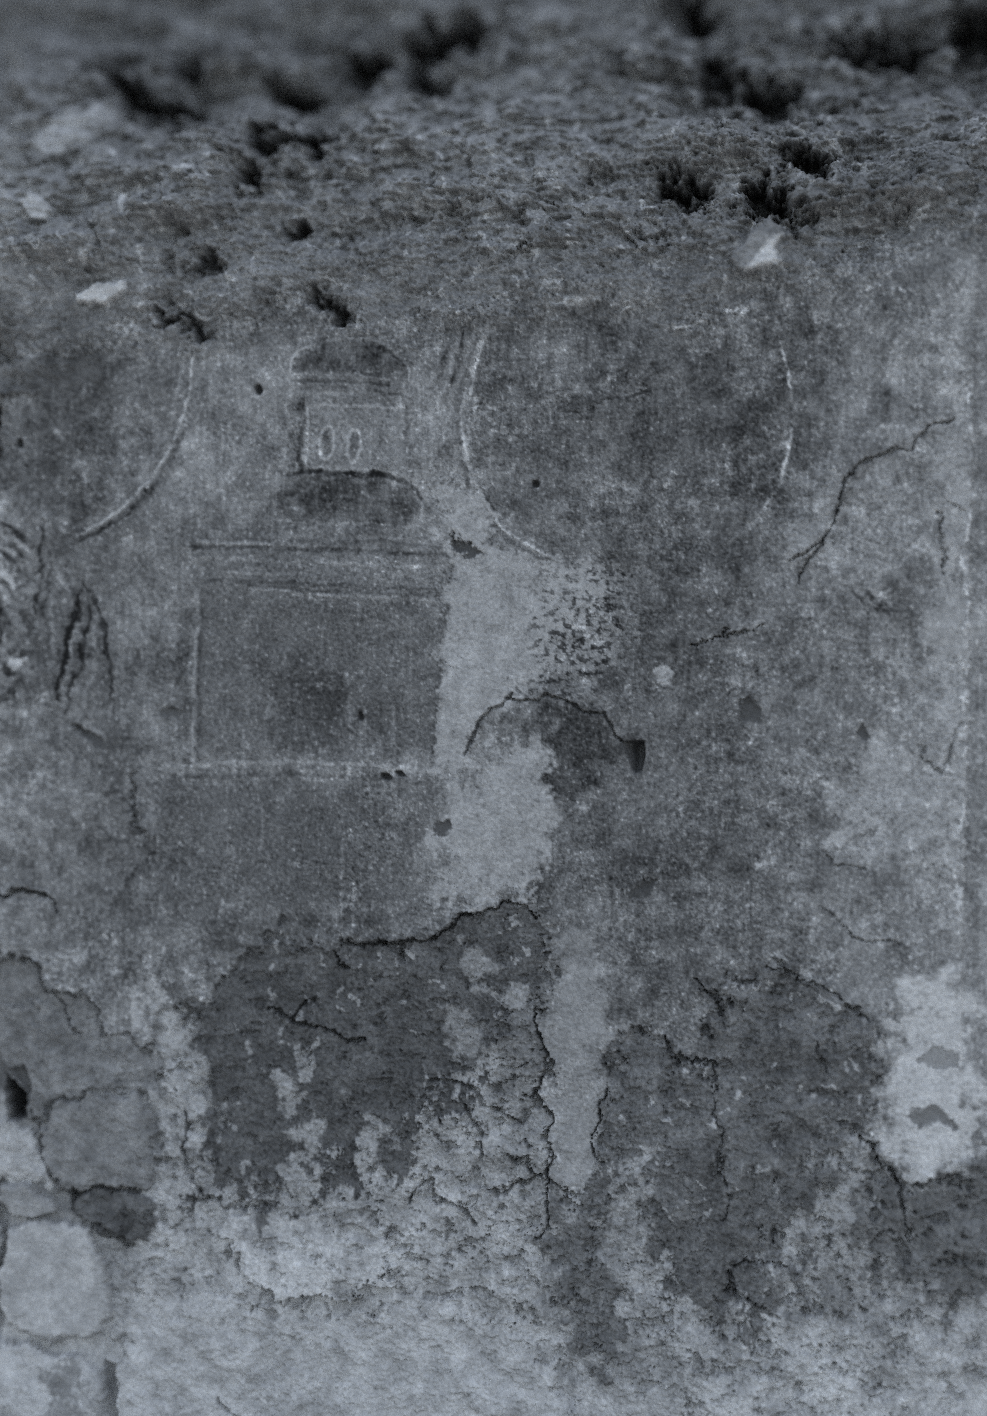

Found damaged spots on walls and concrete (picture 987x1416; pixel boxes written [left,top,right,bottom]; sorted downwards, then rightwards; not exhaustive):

hole [83,56,222,135]
hole [227,9,498,202]
hole [649,0,846,234]
hole [815,0,987,85]
crack [789,418,956,586]
crack [463,692,633,756]
crack [334,899,542,971]
crack [29,1110,142,1249]
flaking render [186,896,562,1221]
crack [405,1006,578,1241]
flaking render [579,965,884,1366]
crack [854,1130,947,1240]